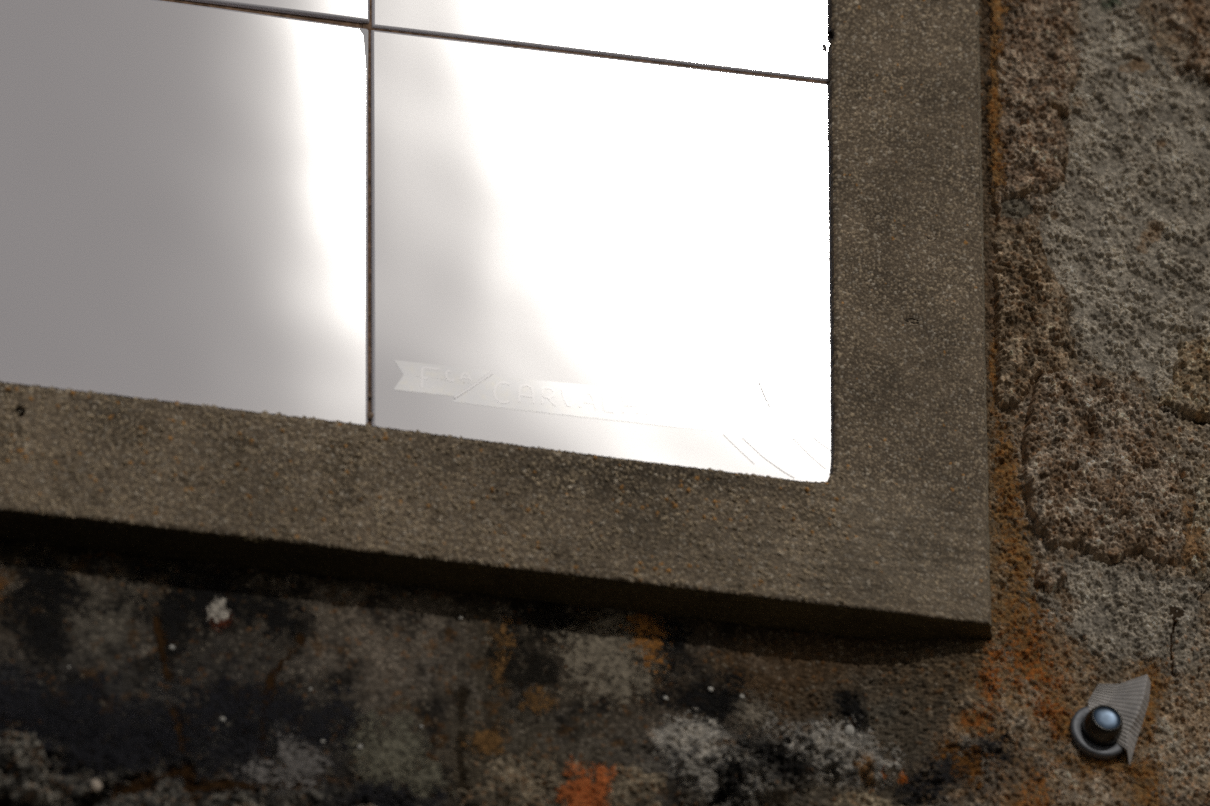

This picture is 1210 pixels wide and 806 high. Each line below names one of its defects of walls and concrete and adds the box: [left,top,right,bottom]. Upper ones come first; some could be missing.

crack [1159,407,1210,425]
damp [0,547,473,806]
damp [485,602,1019,806]
crack [1170,587,1208,676]